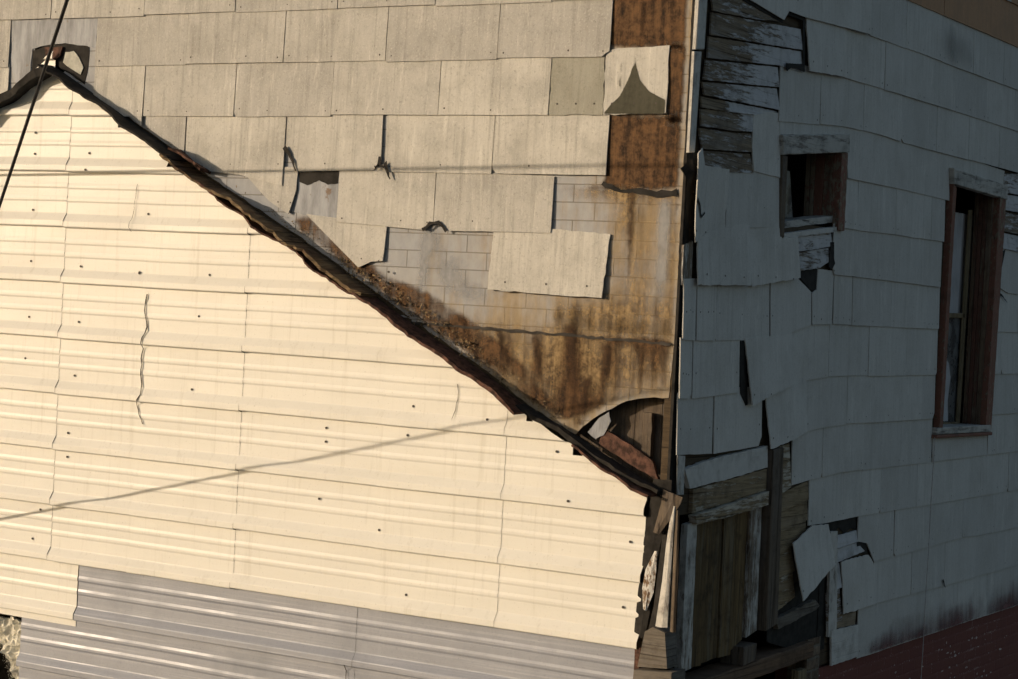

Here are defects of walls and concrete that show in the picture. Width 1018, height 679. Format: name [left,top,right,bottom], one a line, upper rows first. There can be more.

leakage [604,63,665,114]
peeling [697,0,805,173]
rust [168,147,671,424]
peeling [1003,174,1018,252]
peeling [778,443,809,610]
peeling [817,517,868,637]